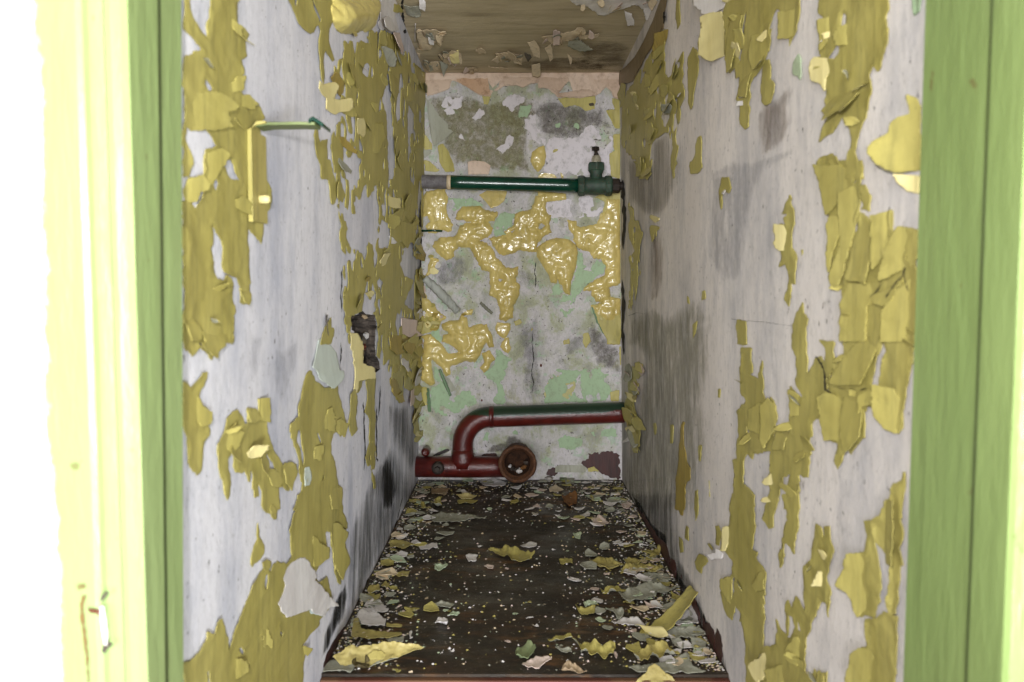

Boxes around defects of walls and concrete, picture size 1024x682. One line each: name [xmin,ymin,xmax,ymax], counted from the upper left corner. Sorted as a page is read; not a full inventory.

leakage [436,98,605,169]
peeling [182,0,921,682]